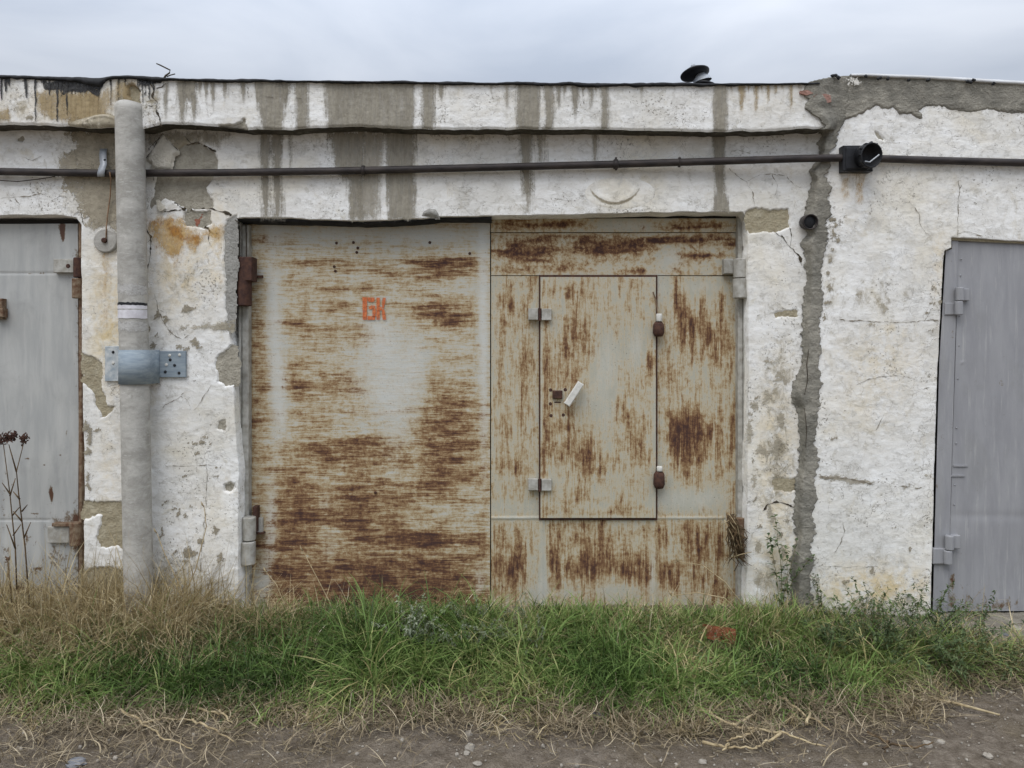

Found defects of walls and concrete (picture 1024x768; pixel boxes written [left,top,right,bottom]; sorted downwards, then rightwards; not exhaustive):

leakage [36,82,139,231]
flaking render [150,143,218,229]
leakage [145,81,230,147]
leakage [241,82,309,219]
leakage [324,83,443,221]
leakage [506,85,609,207]
leakage [712,85,777,213]
flaking render [744,208,789,233]
flaking render [176,215,242,387]
flaking render [81,353,114,455]
crack [802,350,810,448]
flaking render [81,473,123,549]